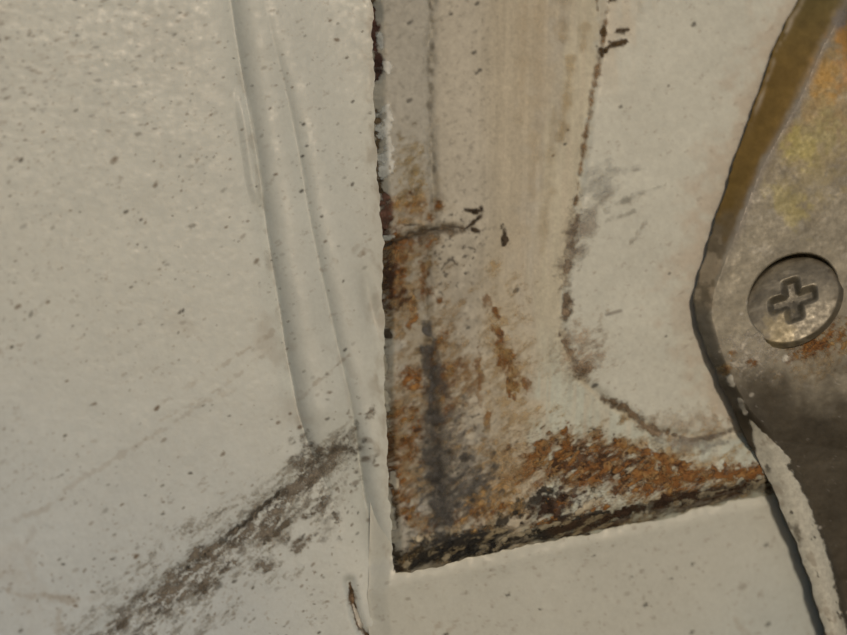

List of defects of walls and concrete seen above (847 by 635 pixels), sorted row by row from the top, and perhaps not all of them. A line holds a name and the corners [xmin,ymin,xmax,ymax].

peeling [371,0,393,82]
peeling [374,104,395,241]
rust [382,147,541,531]
rust [717,323,847,387]
rust [453,411,767,532]